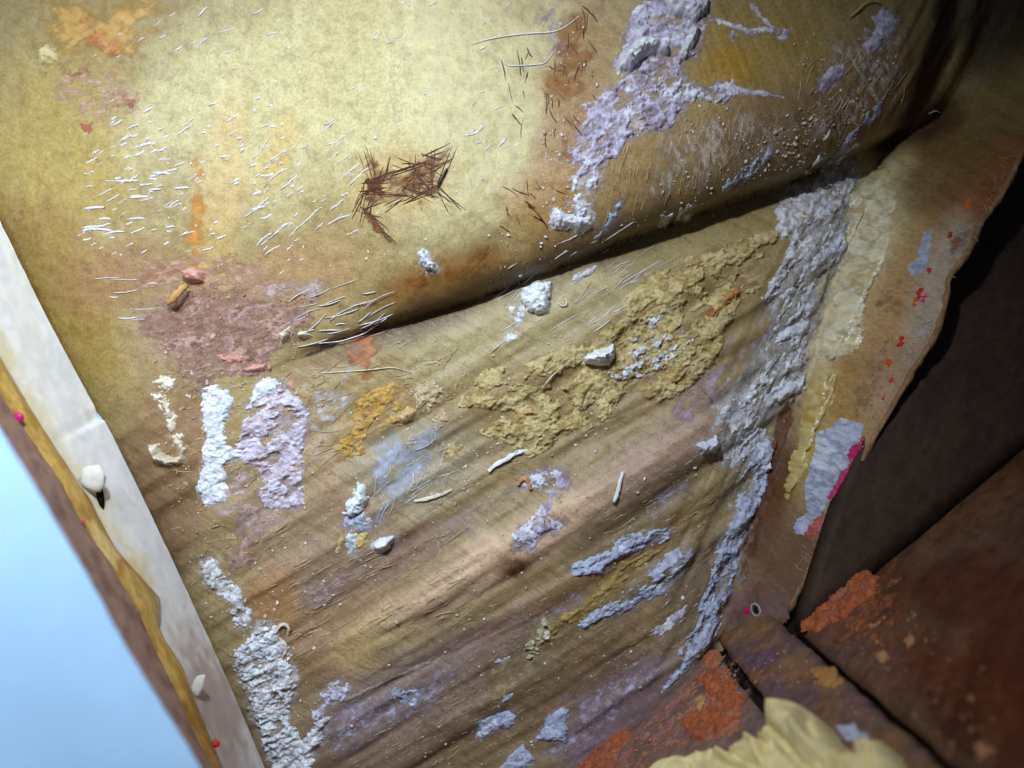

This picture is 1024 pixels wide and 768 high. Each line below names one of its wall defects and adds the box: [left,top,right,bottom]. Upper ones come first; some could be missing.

rust [352,143,465,243]
water stain [566,164,603,233]
water stain [761,397,795,500]